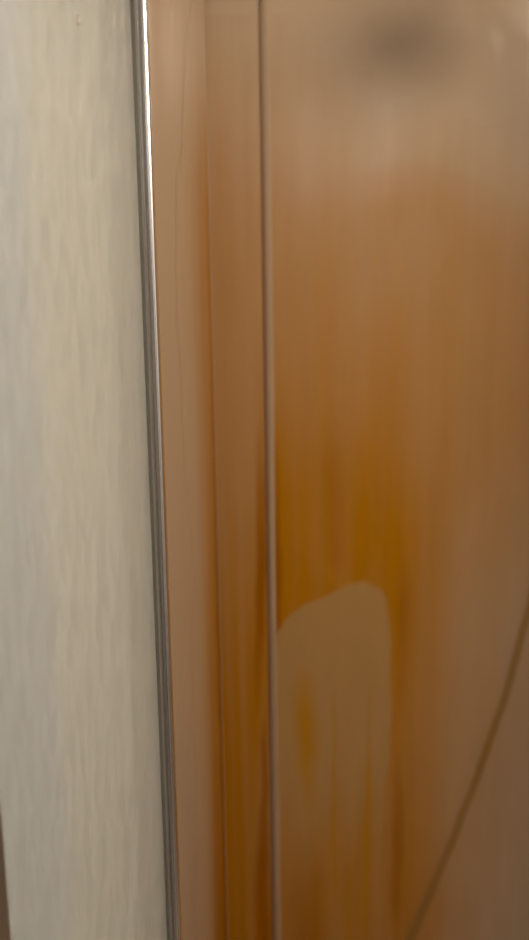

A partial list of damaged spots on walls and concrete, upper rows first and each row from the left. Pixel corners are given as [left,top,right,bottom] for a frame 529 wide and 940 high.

peeling [274,576,395,940]
corrosion [205,13,529,940]